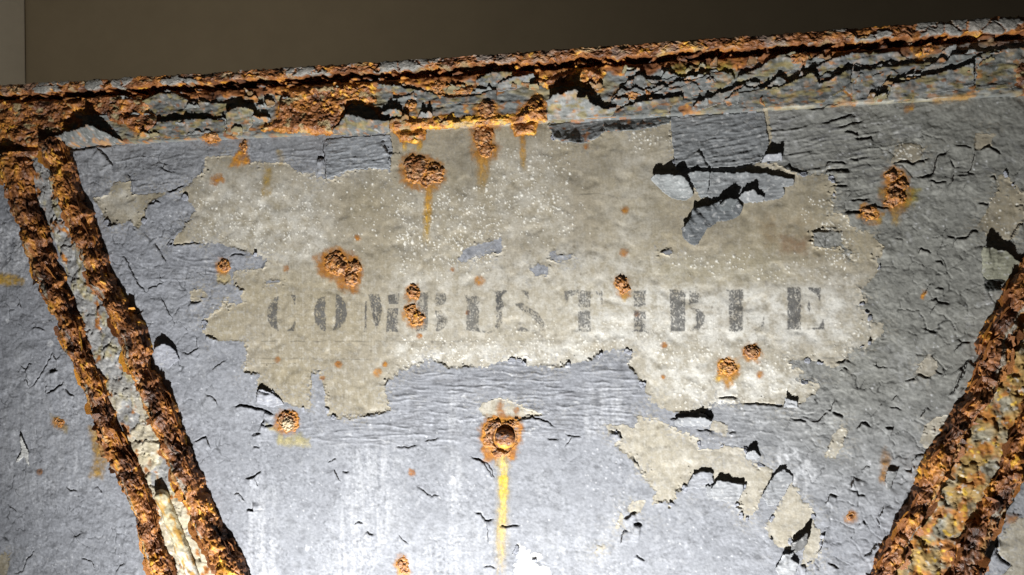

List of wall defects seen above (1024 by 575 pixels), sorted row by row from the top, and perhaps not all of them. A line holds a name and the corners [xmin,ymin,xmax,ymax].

rust [0,95,161,160]
rust [260,81,377,136]
rust [391,65,606,166]
crack [789,103,888,213]
crack [895,145,999,186]
rust [1014,62,1024,89]
rust [0,274,24,286]
peeling [166,44,1024,575]
crack [670,230,978,434]
crack [211,396,274,511]
crack [527,416,582,444]
crack [826,466,884,557]